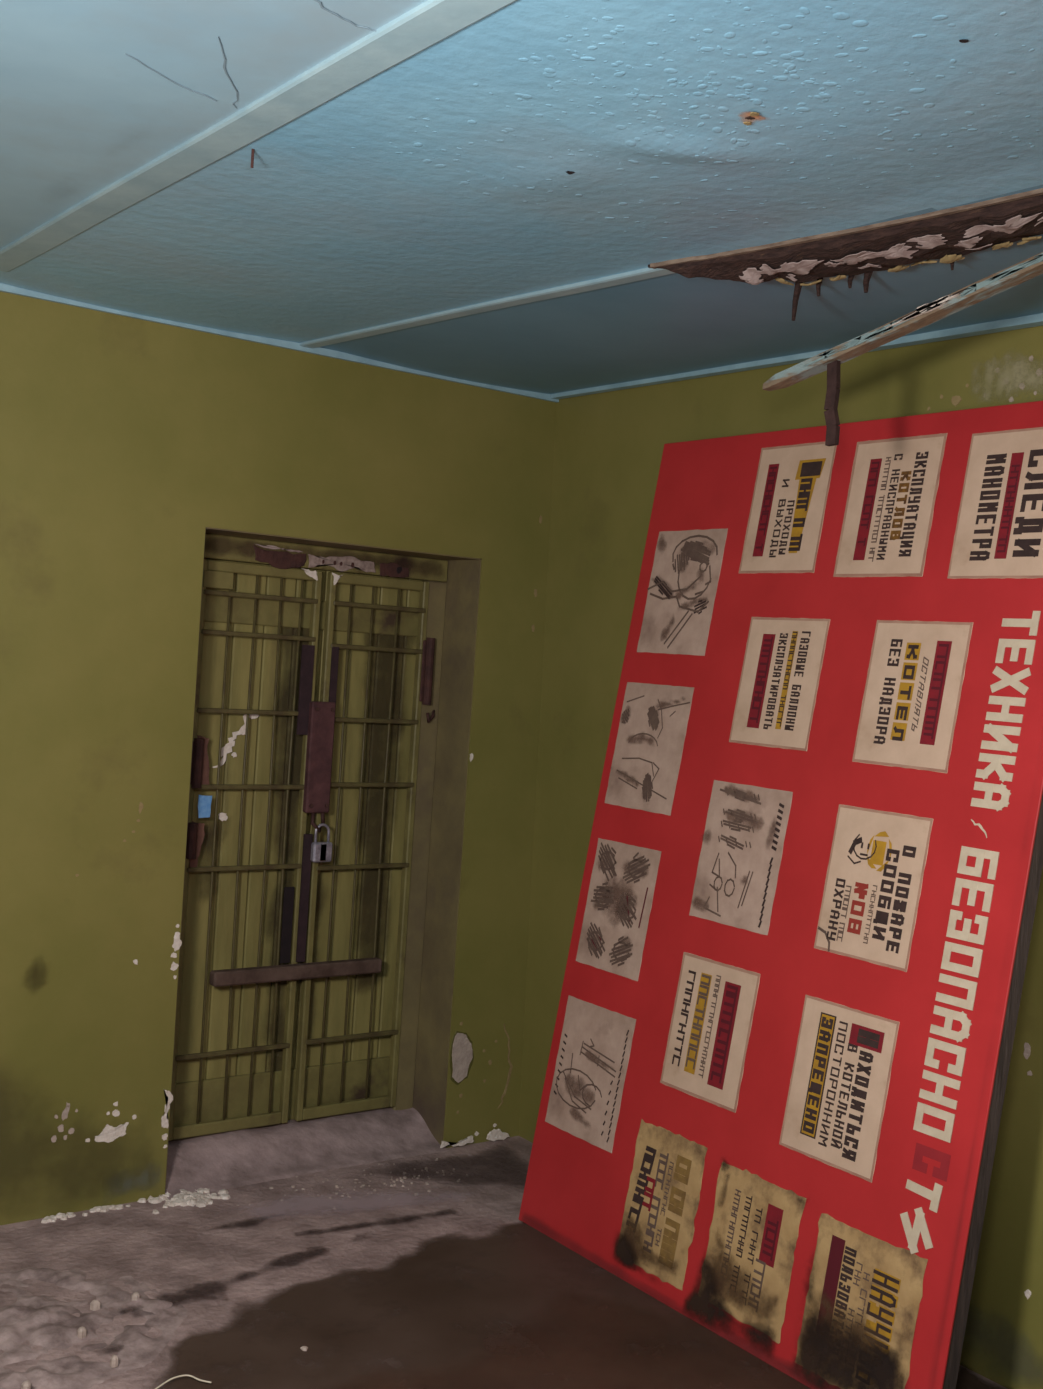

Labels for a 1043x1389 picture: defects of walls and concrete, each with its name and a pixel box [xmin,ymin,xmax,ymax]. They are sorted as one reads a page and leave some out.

crack [314,0,377,31]
crack [125,36,238,108]
peeling [739,212,1043,286]
peeling [885,294,961,329]
peeling [213,714,259,768]
peeling [170,924,182,979]
spalling [440,1021,513,1148]
peeling [51,1101,136,1143]
spalling [161,1090,173,1148]